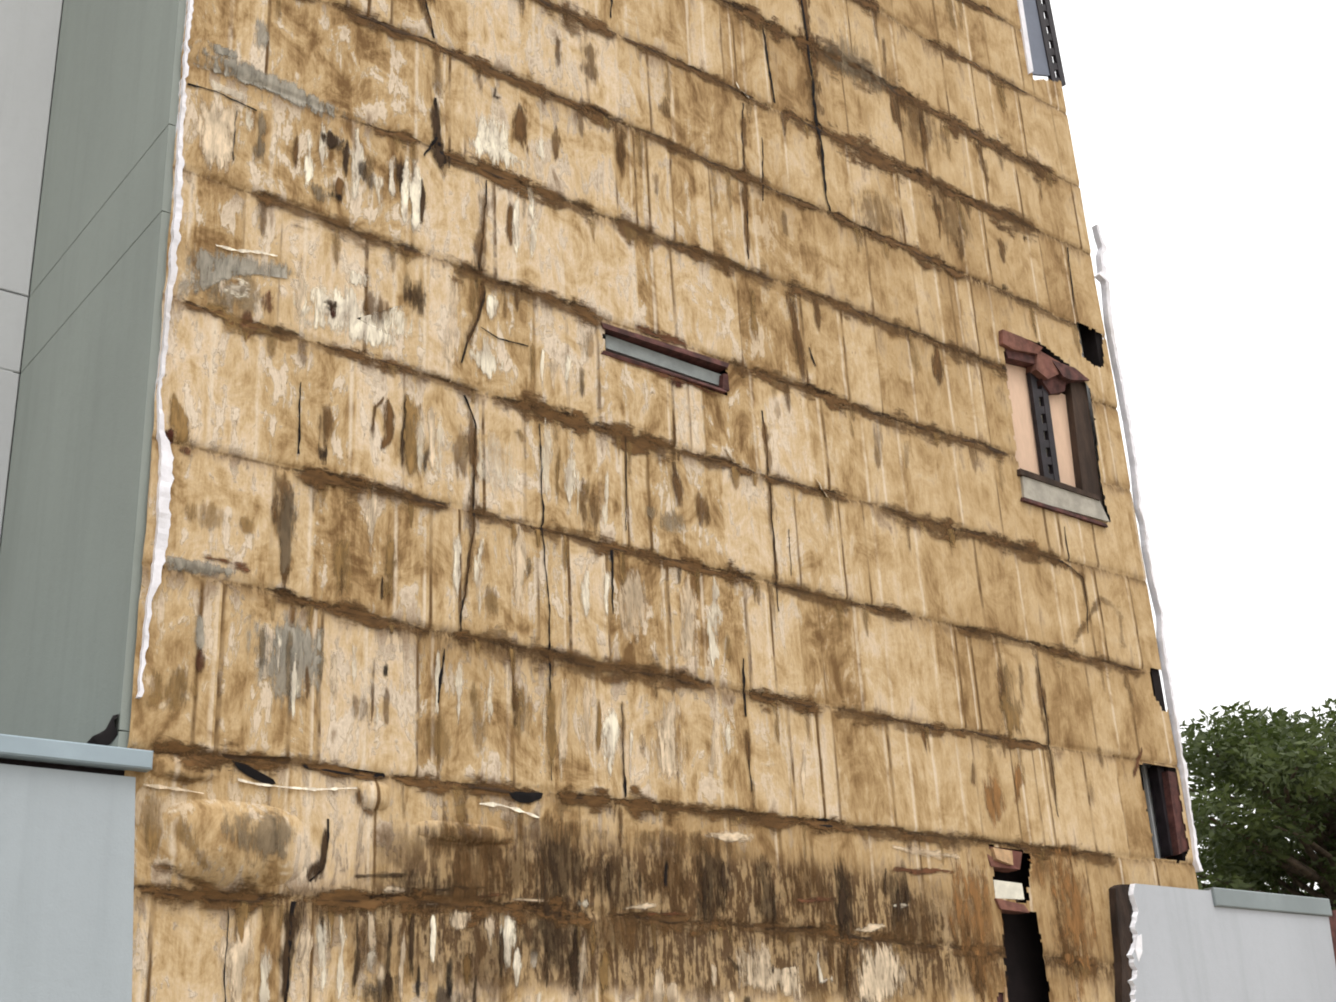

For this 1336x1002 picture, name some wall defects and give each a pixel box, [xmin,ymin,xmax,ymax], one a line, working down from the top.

peeling [196,44,426,230]
crack [419,0,451,168]
leakage [337,0,1056,280]
crack [740,0,831,259]
peeling [182,245,426,347]
crack [461,180,528,363]
leakage [612,214,1008,462]
peeling [249,616,357,716]
leakage [266,394,449,633]
crack [437,395,479,703]
leakage [493,391,848,532]
leakage [137,738,1116,1002]